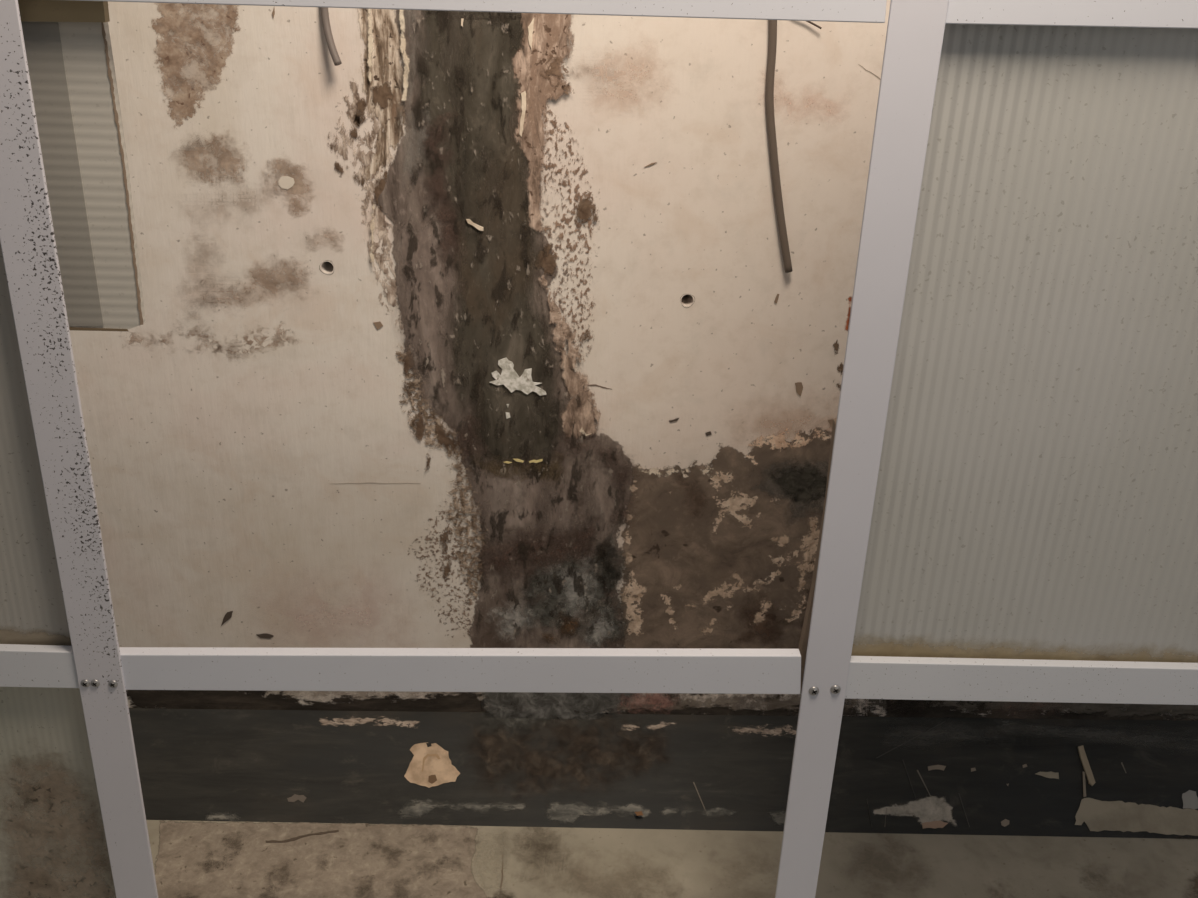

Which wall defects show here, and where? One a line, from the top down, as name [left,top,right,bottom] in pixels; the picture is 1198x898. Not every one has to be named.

damp [152,3,240,125]
damp [182,136,244,183]
damp [265,160,309,214]
damp [202,262,305,304]
spalling [328,8,833,649]
peeling [404,742,460,788]
peeling [1023,764,1059,779]
damp [3,759,114,898]
peeling [1075,790,1198,836]